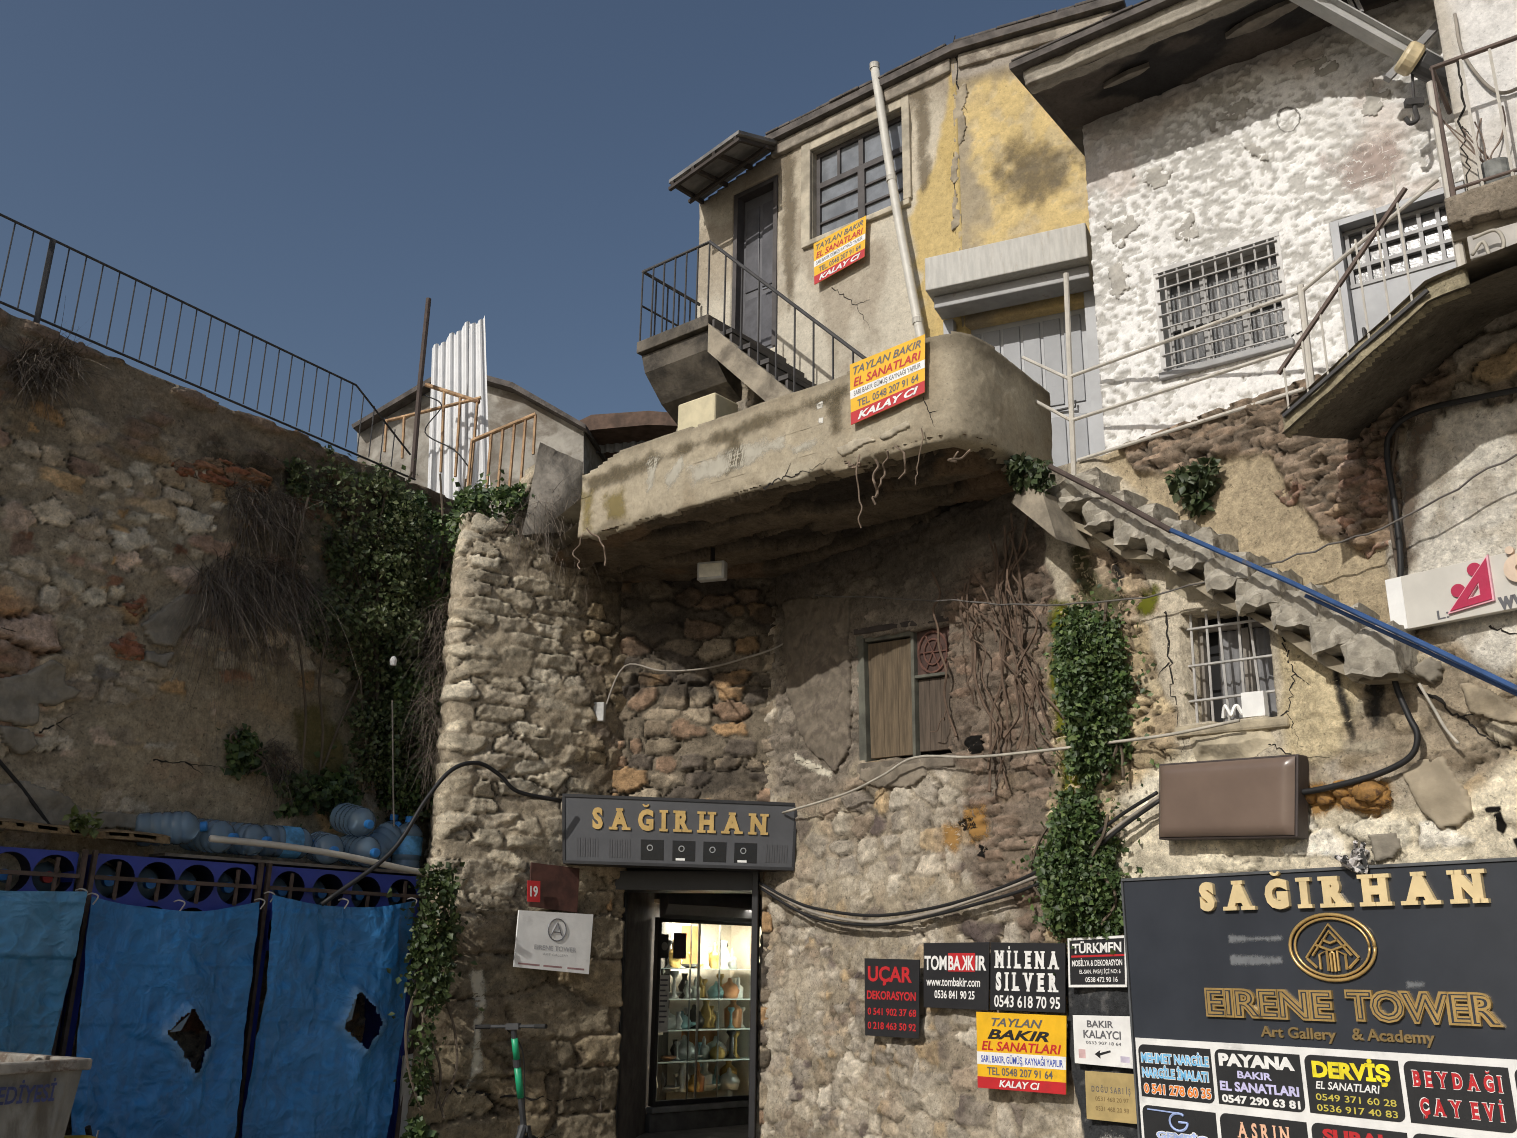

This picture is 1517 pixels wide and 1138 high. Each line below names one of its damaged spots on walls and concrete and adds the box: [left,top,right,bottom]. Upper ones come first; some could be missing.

crack [1456,61,1472,190]
leakage [995,147,1066,203]
spalling [1274,474,1306,507]
spalling [1324,428,1403,559]
crack [1159,611,1185,752]
peeling [1460,683,1517,724]
peeling [1402,756,1517,848]